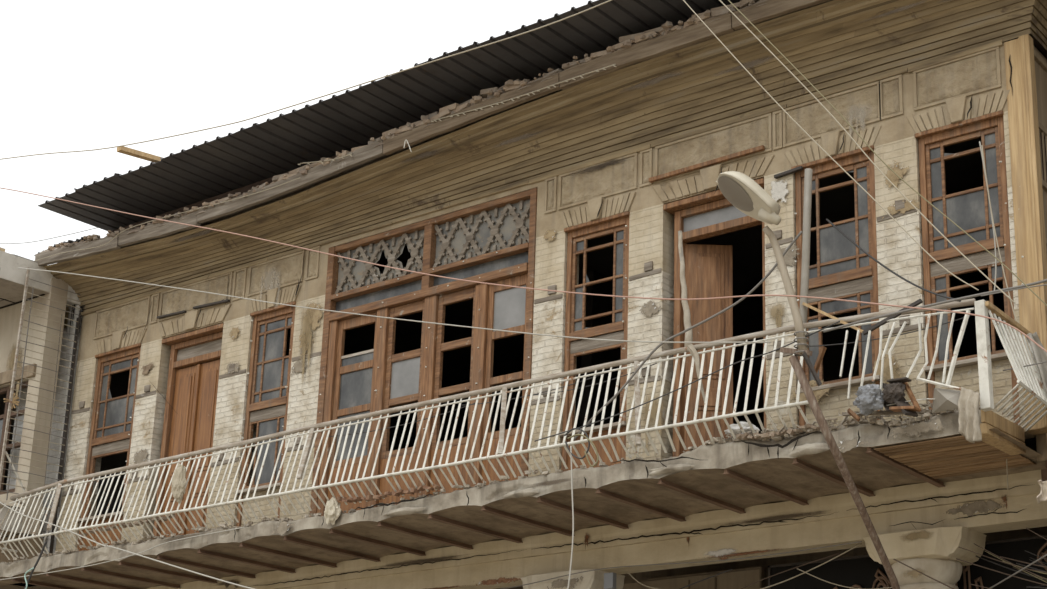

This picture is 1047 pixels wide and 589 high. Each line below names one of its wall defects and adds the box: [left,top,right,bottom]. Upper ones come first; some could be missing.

peeling [884,161,909,190]
peeling [771,181,788,203]
crack [741,431,818,458]
peeling [946,500,1006,516]
crack [236,484,1035,588]